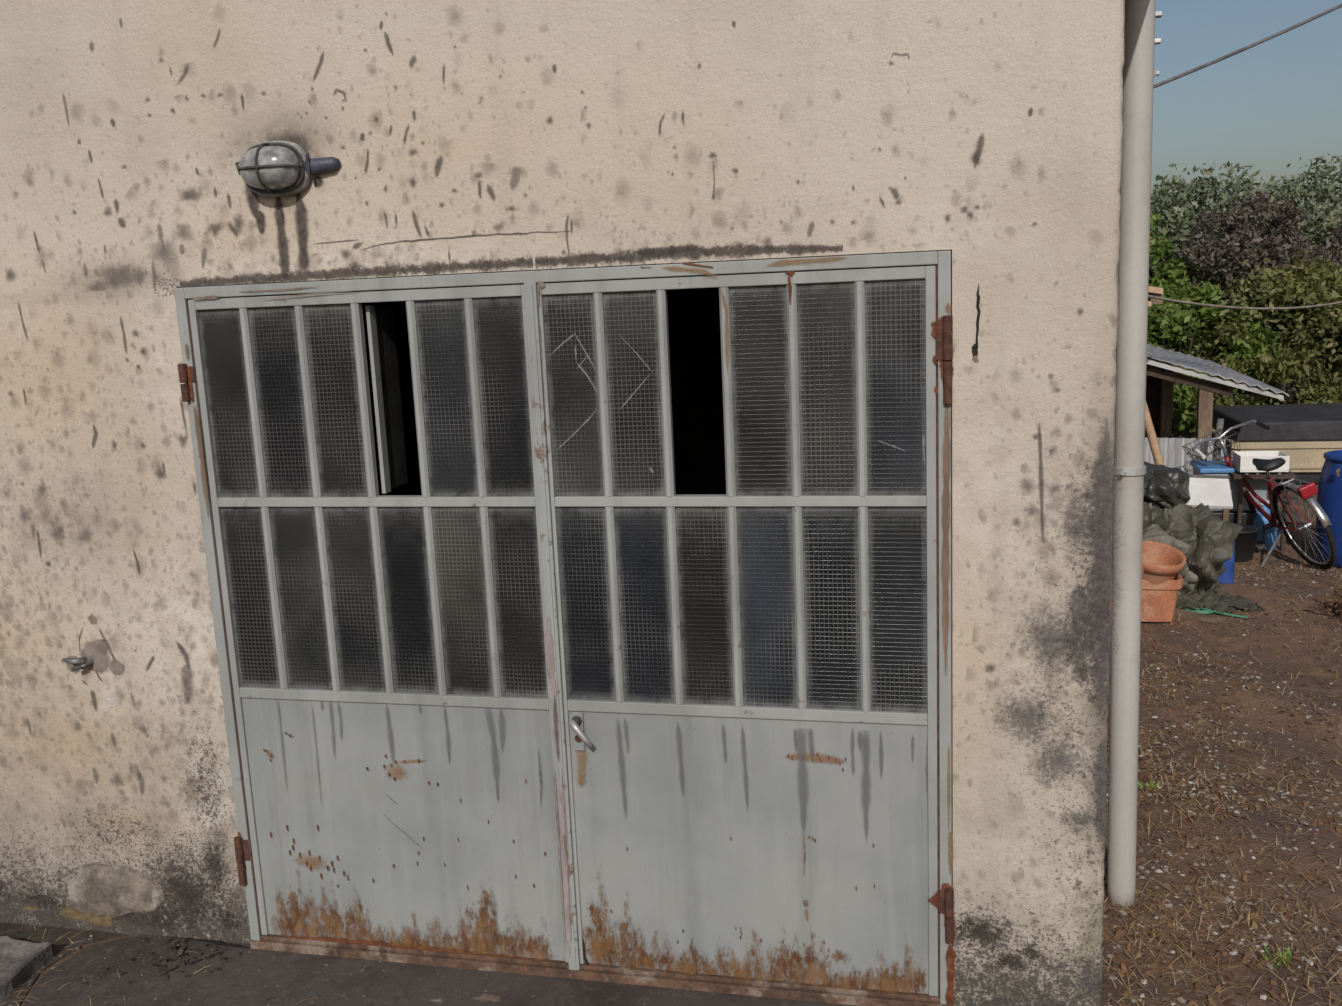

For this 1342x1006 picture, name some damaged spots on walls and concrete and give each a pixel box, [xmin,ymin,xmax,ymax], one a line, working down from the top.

water stain [152,226,186,286]
water stain [179,185,843,288]
water stain [1026,428,1121,713]
water stain [1001,694,1109,838]
rust [273,891,551,961]
rust [582,888,925,993]